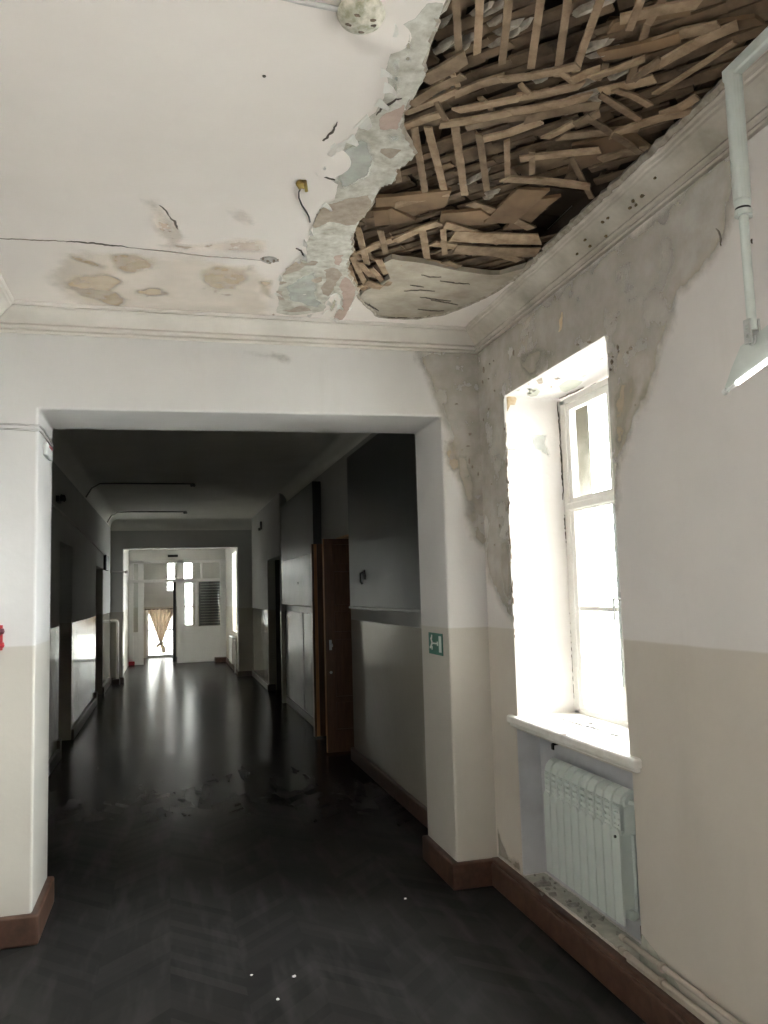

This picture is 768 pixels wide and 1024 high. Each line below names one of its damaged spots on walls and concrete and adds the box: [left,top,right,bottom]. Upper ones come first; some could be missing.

crack [0,205,261,261]
spalling [260,0,768,323]
peeling [482,341,633,566]